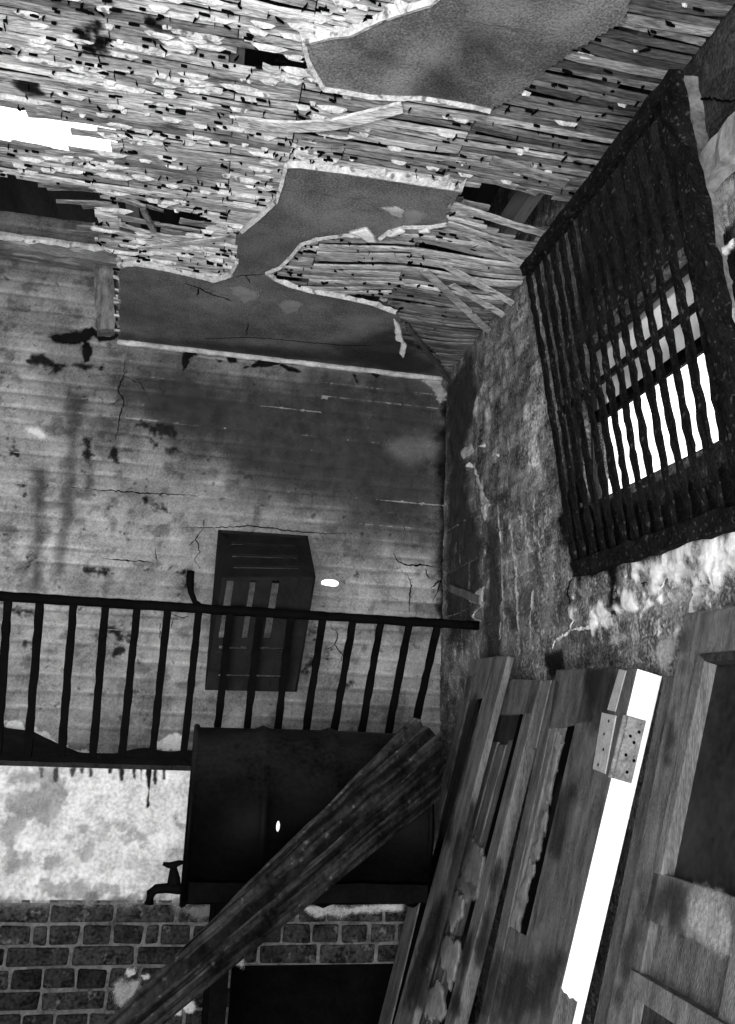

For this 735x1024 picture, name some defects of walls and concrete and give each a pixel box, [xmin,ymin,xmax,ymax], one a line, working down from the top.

spalling [0,0,735,522]
damp [68,395,84,436]
crack [109,364,148,439]
damp [62,481,72,525]
crack [72,487,341,568]
damp [589,532,735,635]